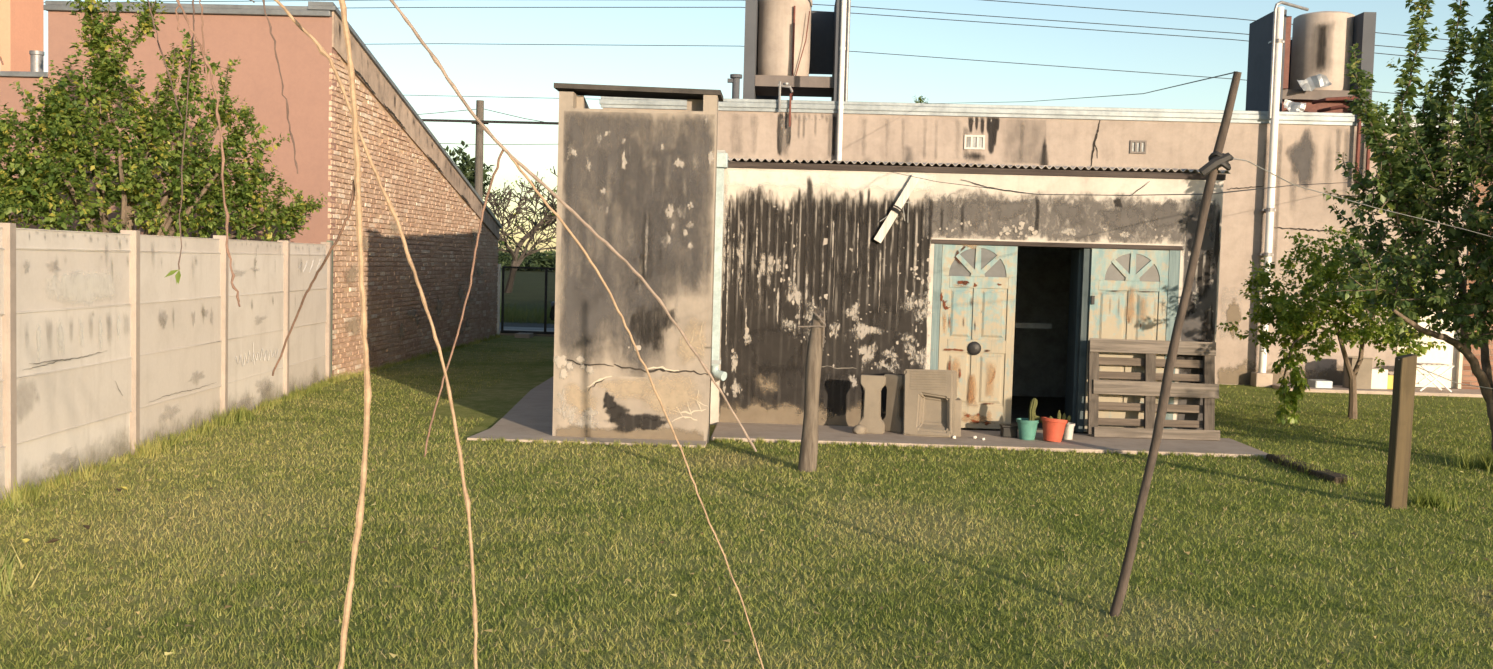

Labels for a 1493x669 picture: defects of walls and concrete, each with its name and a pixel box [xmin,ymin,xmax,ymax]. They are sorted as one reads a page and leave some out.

peeling [729,171,928,189]
peeling [661,202,694,249]
peeling [737,206,828,343]
peeling [823,213,972,387]
leakage [561,113,1343,430]
corrosion [940,244,982,328]
leakage [556,392,704,441]
crack [567,323,708,422]
corrosion [944,349,995,425]